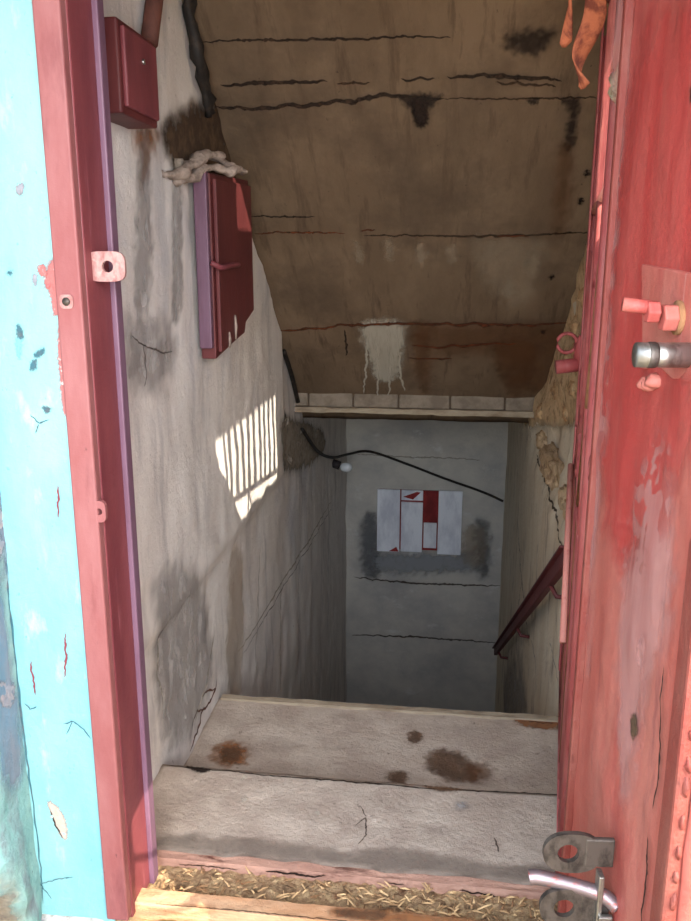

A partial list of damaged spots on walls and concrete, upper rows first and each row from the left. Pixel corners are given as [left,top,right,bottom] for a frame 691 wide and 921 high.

crack [204,35,450,43]
crack [216,72,597,127]
damp [562,99,580,151]
damp [363,322,405,395]
spalling [525,246,587,426]
peeling [0,492,8,567]
crack [537,456,562,567]
peeling [0,595,21,786]
damp [212,742,247,766]
damp [426,749,481,782]